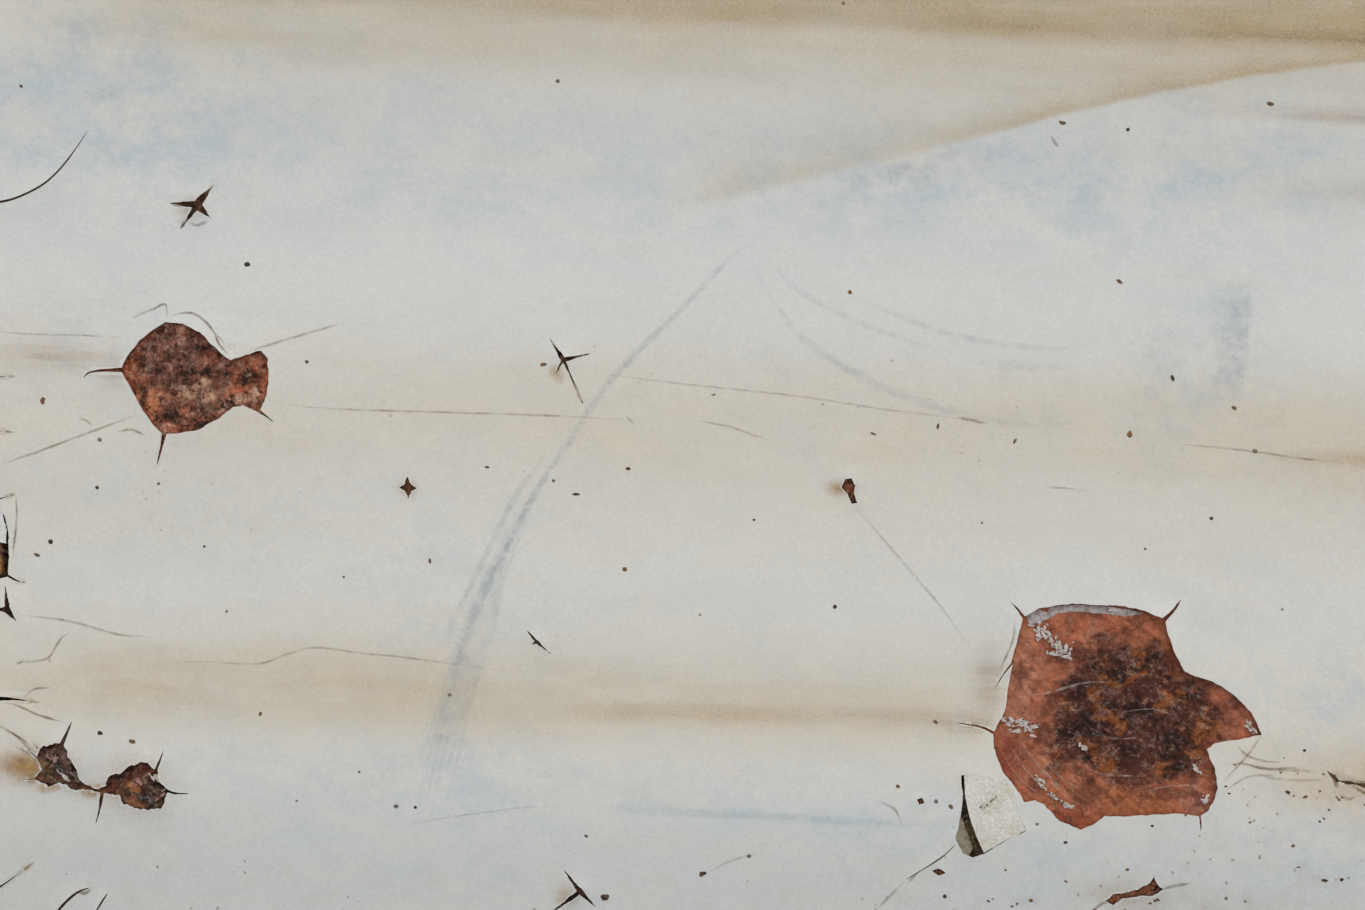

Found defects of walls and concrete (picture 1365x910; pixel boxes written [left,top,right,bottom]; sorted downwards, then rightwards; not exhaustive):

crack [144,161,237,252]
crack [524,314,619,428]
peeling [824,462,873,519]
peeling [0,224,308,910]
peeling [907,560,1297,910]
crack [1302,747,1365,810]
crack [524,845,621,910]